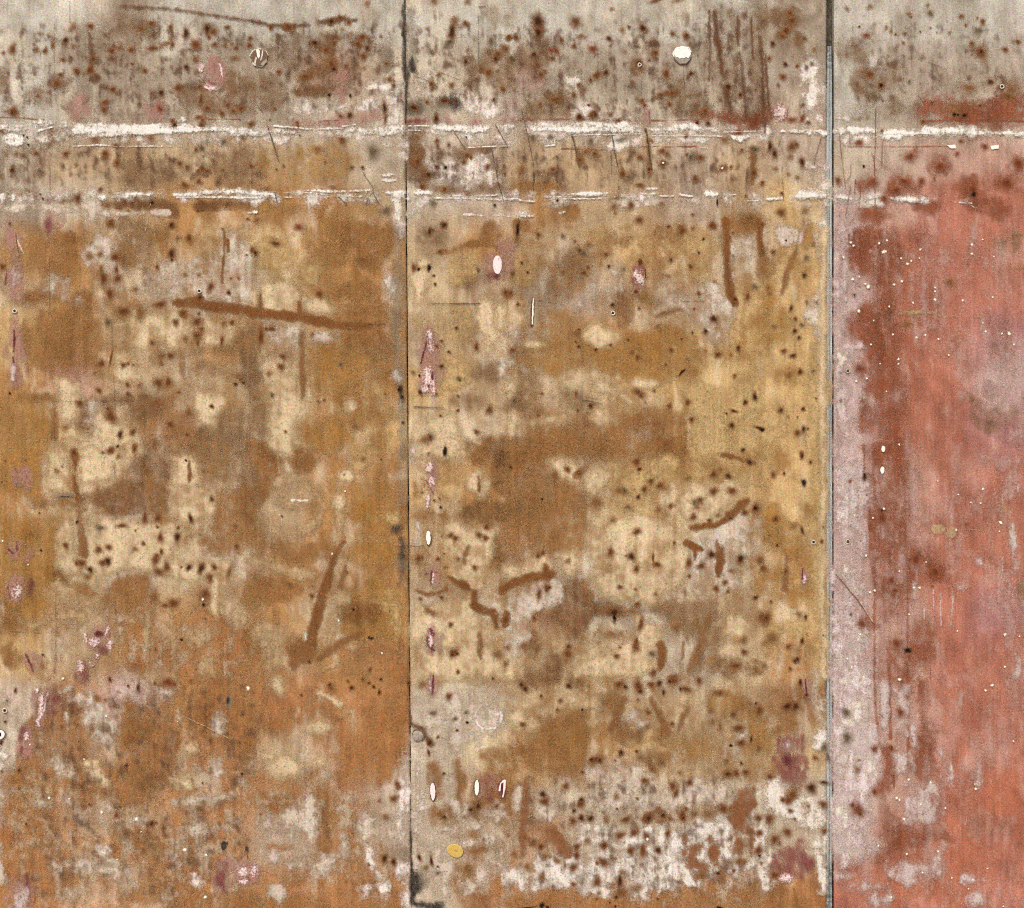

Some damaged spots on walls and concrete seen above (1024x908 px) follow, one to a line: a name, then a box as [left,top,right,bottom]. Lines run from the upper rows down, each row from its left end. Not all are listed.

peeling [0,71,535,239]
corrosion [0,5,815,380]
corrosion [839,25,910,113]
corrosion [959,14,986,59]
corrosion [0,195,829,908]
corrosion [845,79,1024,798]